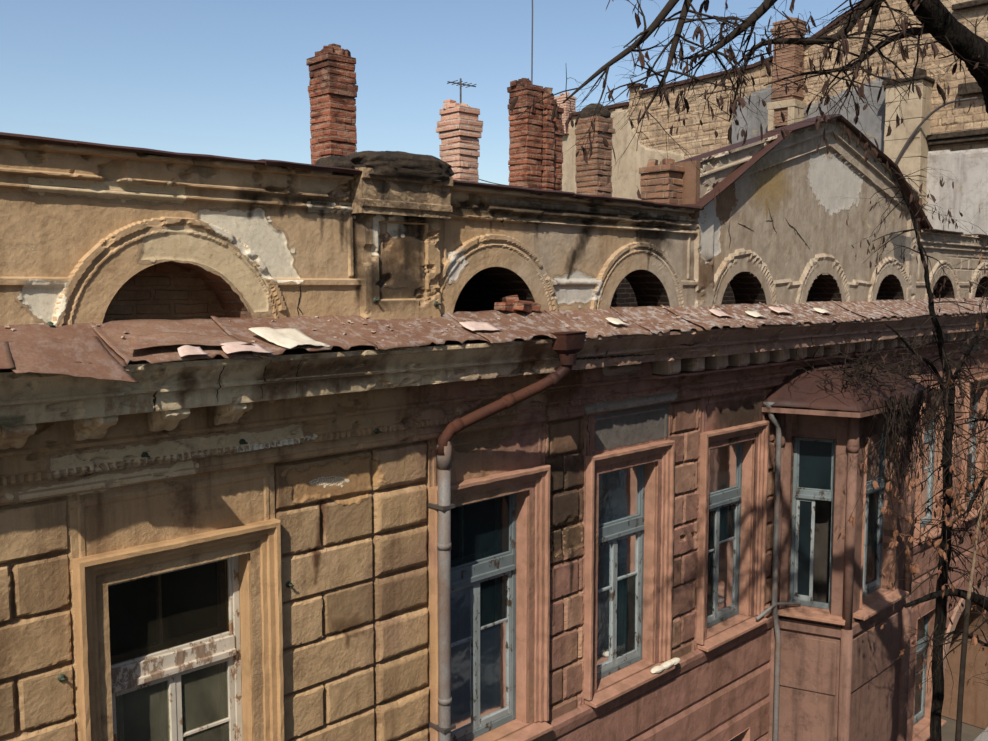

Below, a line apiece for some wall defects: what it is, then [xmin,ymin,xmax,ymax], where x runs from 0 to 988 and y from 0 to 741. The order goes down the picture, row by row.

peeling [806,150,865,218]
peeling [22,172,305,317]
peeling [14,275,71,327]
peeling [552,268,603,308]
peeling [5,422,318,507]
flaking render [281,451,387,506]